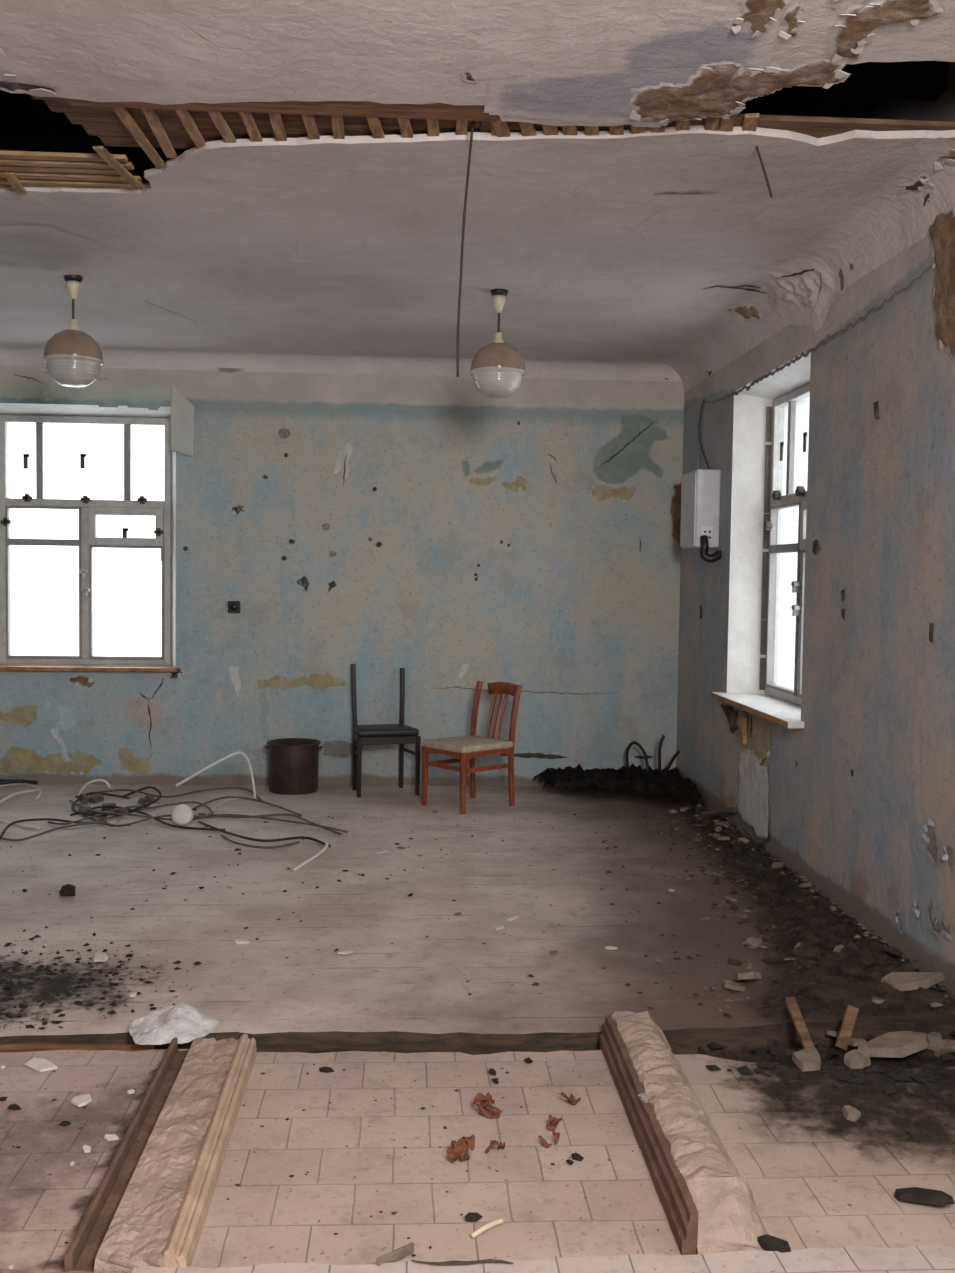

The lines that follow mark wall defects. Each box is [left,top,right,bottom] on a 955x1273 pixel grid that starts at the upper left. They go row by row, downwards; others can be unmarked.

crack [0,49,56,95]
spalling [628,0,951,123]
spalling [929,208,955,368]
peeling [582,410,682,554]
spalling [67,673,97,688]
peeling [255,671,349,695]
peeling [0,704,155,779]